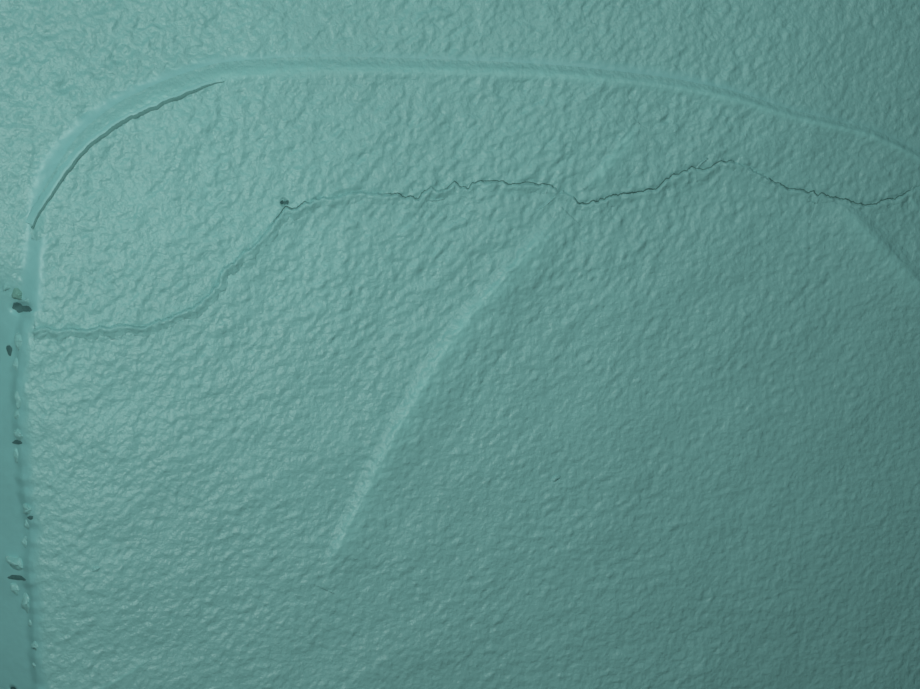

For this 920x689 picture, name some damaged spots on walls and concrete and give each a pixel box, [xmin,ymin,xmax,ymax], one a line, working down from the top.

crack [26,78,224,229]
crack [34,155,920,341]